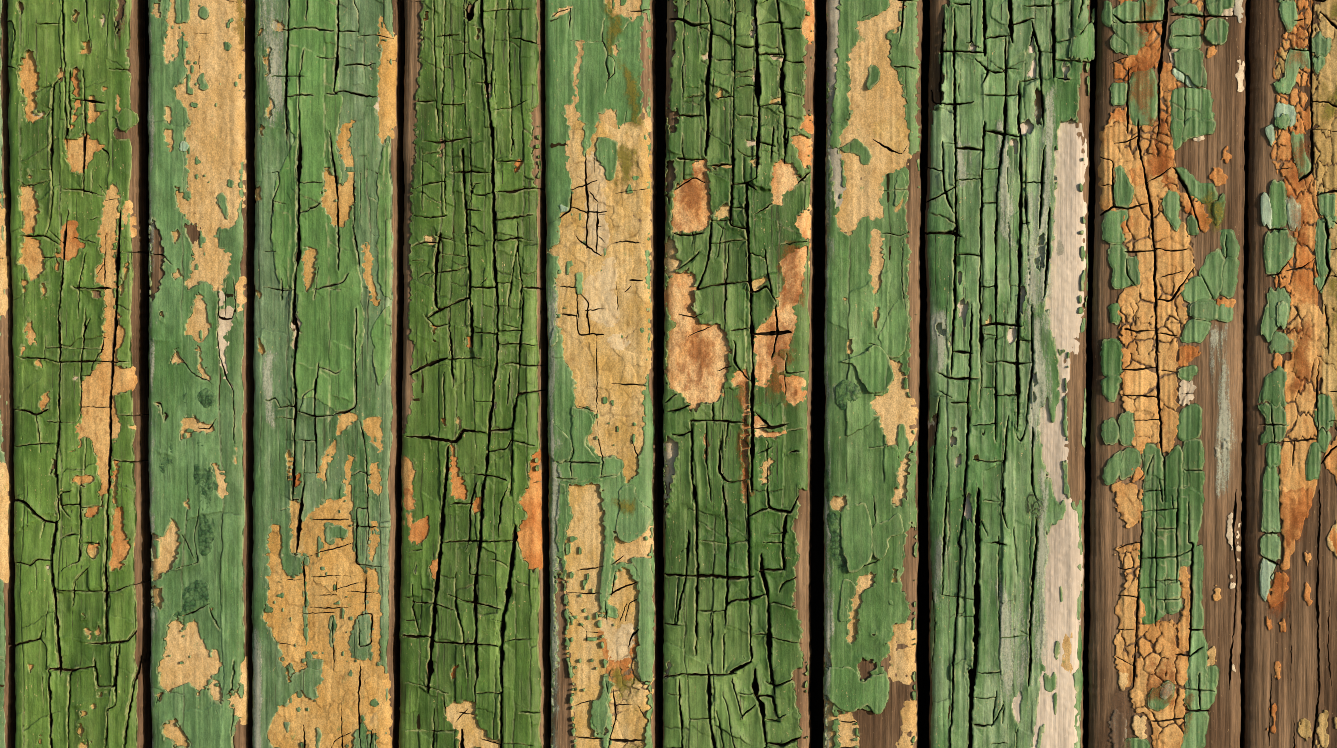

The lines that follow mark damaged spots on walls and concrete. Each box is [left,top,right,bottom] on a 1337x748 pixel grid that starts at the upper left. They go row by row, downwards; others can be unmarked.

crack [15,78,168,748]
peeling [0,0,285,583]
peeling [157,615,249,748]
crack [171,288,237,436]
peeling [263,412,393,748]
peeling [370,0,436,434]
crack [269,0,809,748]
peeling [514,0,812,748]
peeling [746,0,979,748]
crack [873,0,1278,748]
peeling [1010,0,1245,748]
crack [1259,0,1337,748]